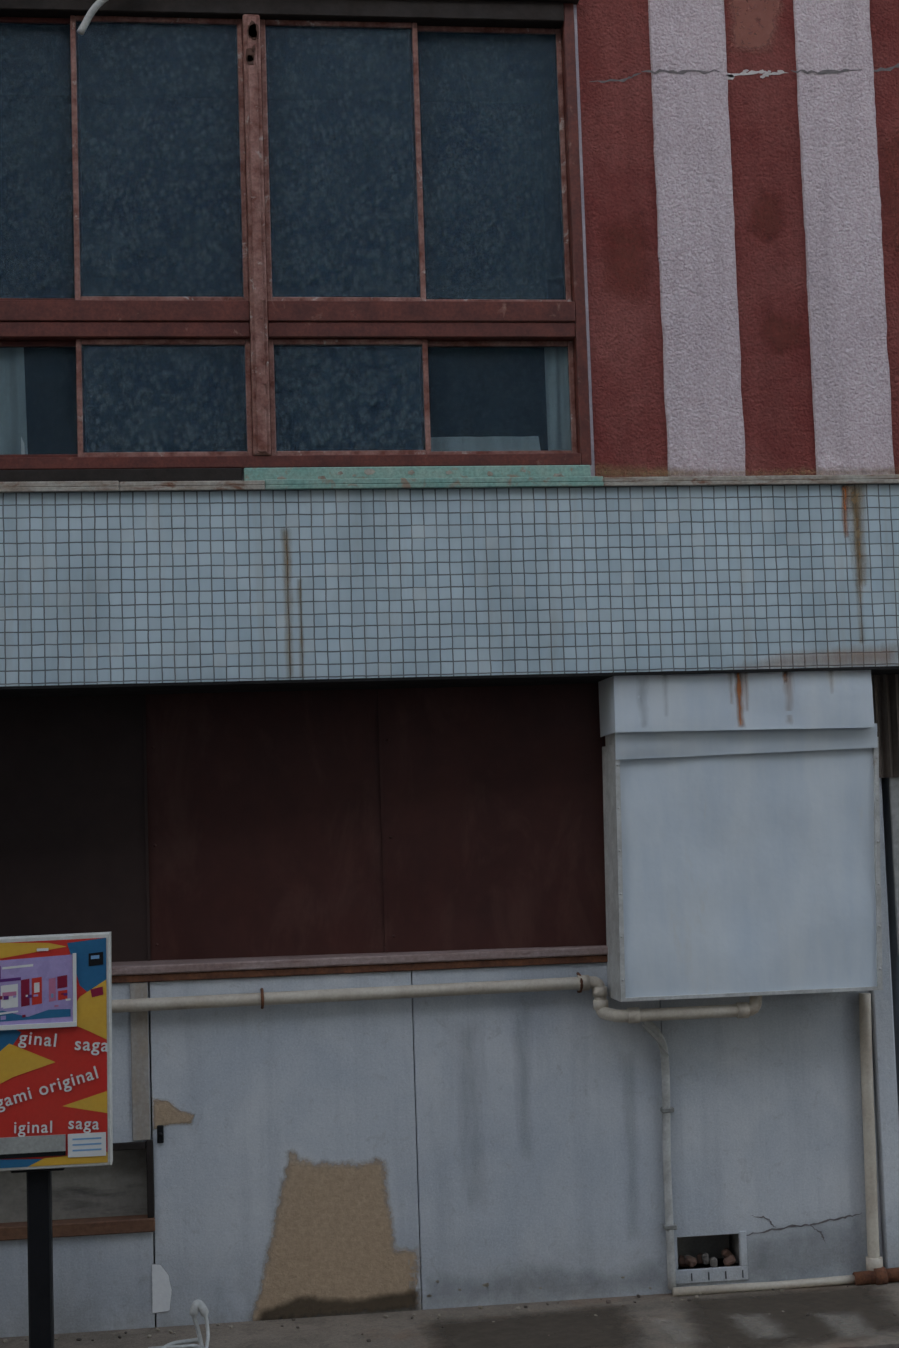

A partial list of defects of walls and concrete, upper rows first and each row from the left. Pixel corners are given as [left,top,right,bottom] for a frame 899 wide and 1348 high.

crack [590,63,899,83]
rust [284,531,300,599]
rust [842,486,862,581]
flaking render [253,1153,439,1321]
crack [746,1214,860,1241]